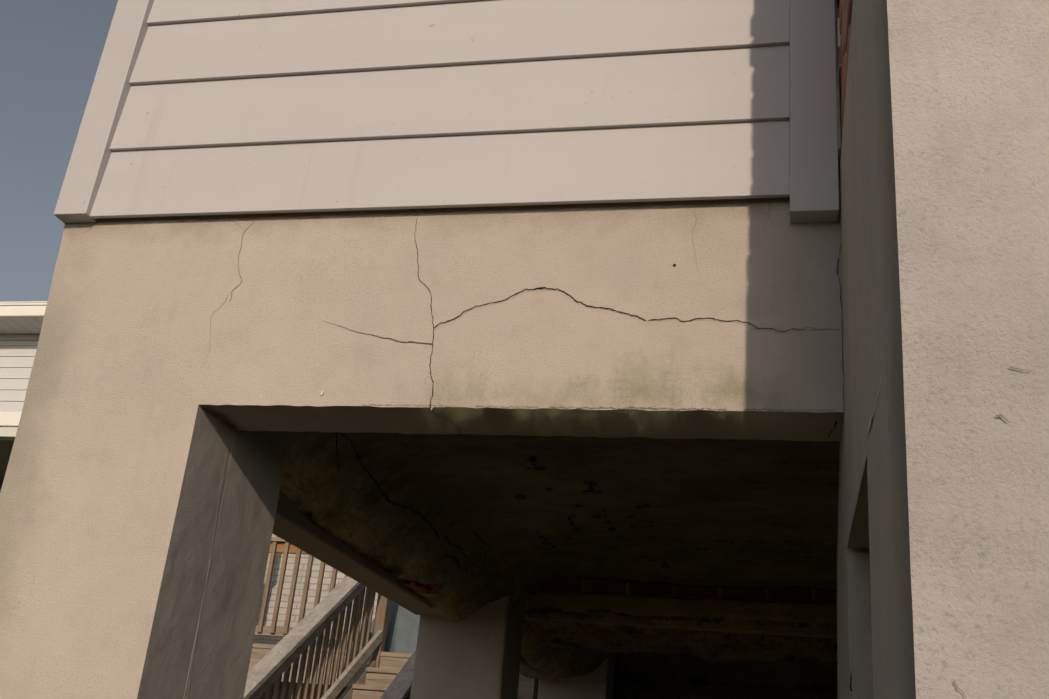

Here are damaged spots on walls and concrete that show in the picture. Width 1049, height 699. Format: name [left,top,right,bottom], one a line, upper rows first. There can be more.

crack [206,214,257,358]
crack [325,209,844,436]